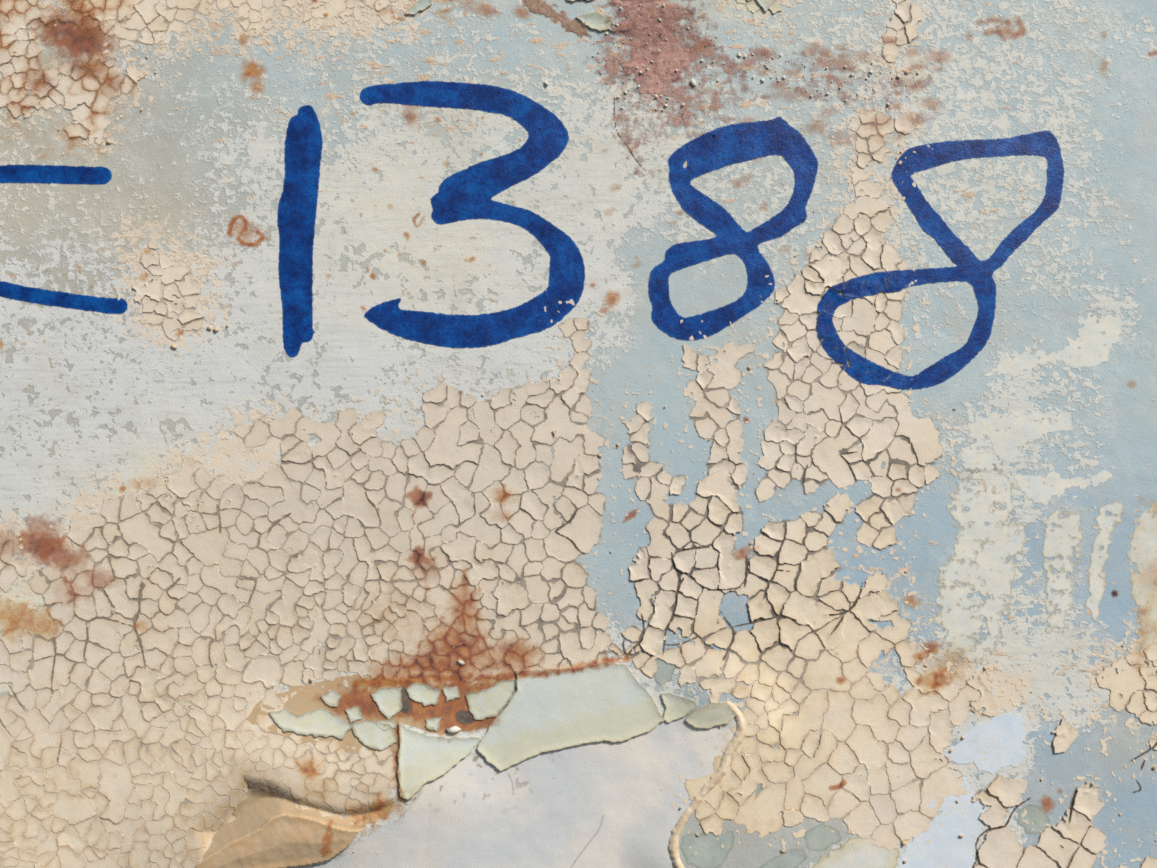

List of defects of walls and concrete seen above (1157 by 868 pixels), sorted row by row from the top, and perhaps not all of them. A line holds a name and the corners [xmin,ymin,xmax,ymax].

rust [39,0,113,86]
peeling [0,0,432,145]
rust [244,63,261,91]
rust [518,0,769,176]
peeling [756,107,942,549]
crack [35,578,181,695]
rust [319,575,630,807]
peeling [0,317,1108,868]
crack [555,510,585,555]
crack [622,528,796,660]
crack [829,582,863,634]
peeling [934,411,1157,726]